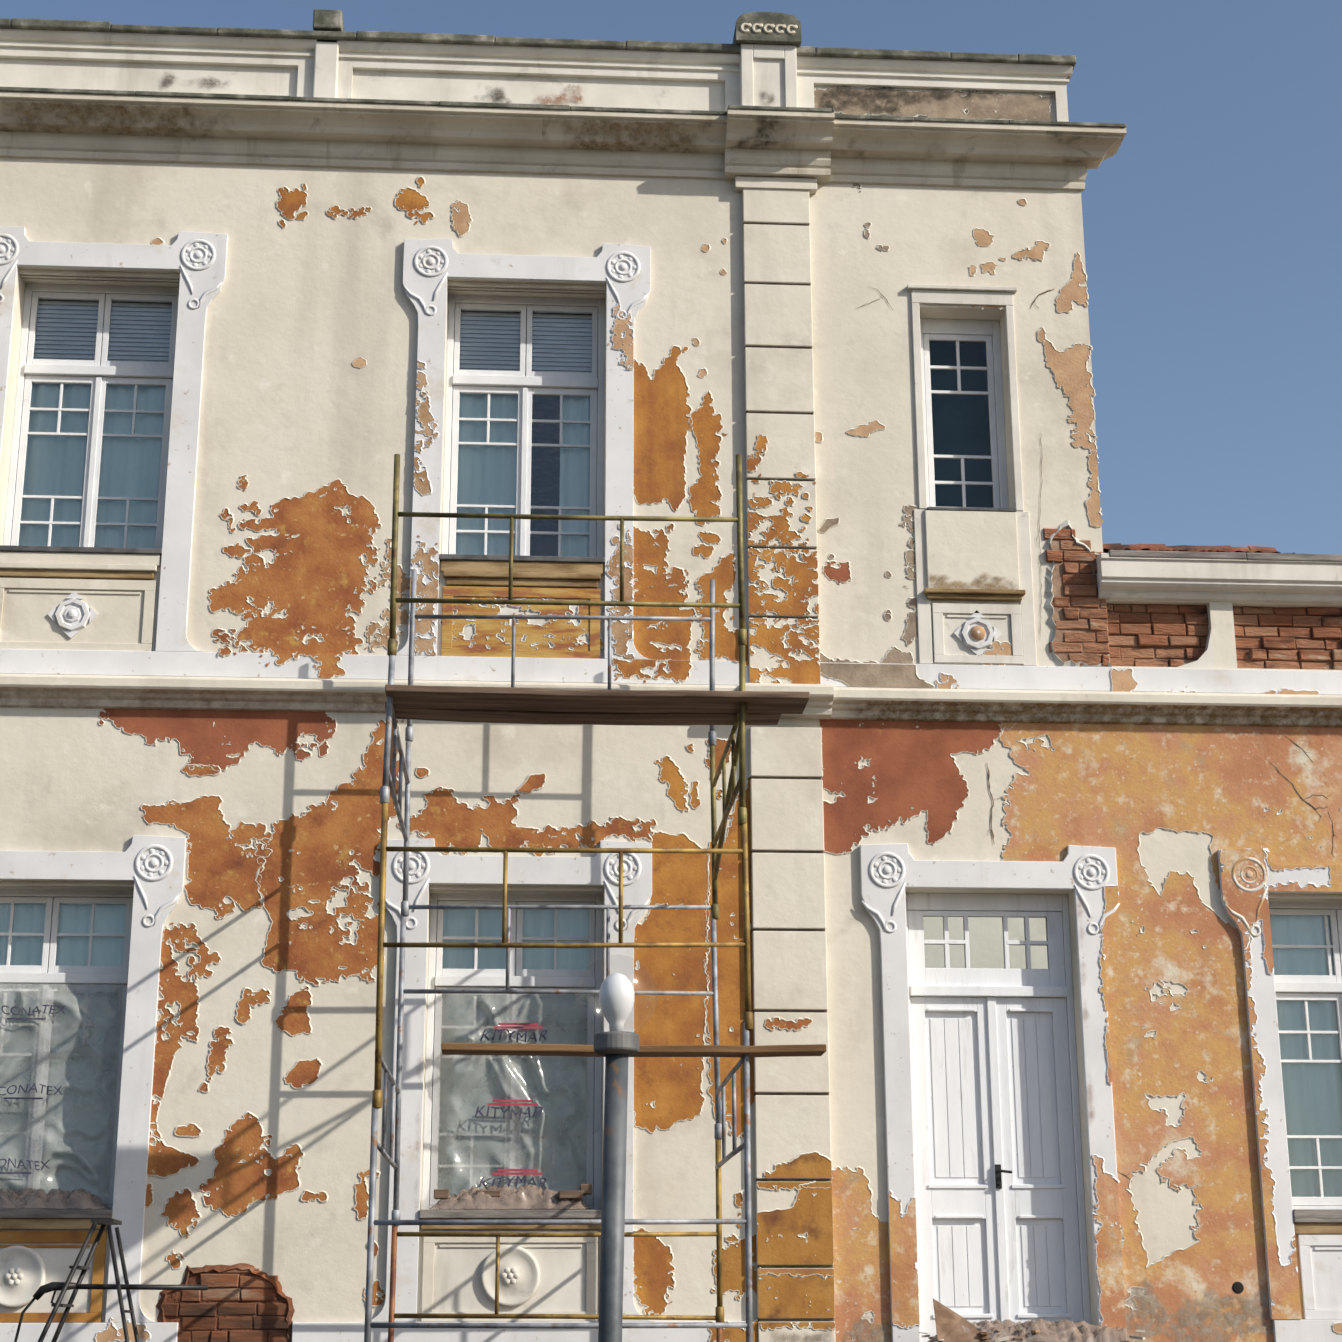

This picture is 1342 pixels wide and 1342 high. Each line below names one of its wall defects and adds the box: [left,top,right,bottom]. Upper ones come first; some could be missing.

peeling [275,183,309,229]
peeling [326,205,373,220]
peeling [393,176,473,238]
peeling [701,237,728,253]
peeling [1054,252,1089,314]
peeling [207,304,959,689]
flaking render [1036,326,1138,692]
peeling [98,708,338,778]
crack [1270,736,1338,857]
peeling [94,719,813,1342]
peeling [817,719,1342,1342]
peeling [707,1151,920,1342]